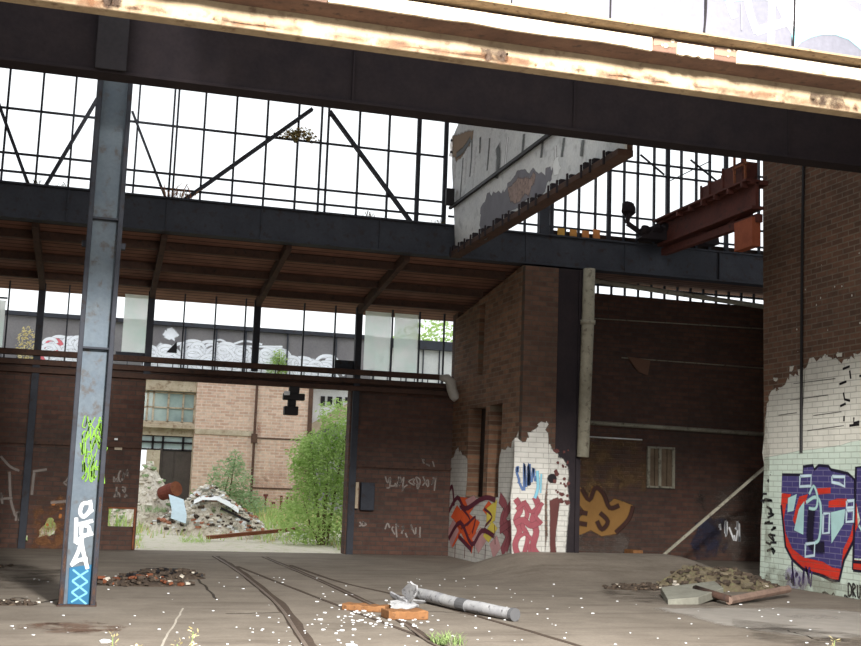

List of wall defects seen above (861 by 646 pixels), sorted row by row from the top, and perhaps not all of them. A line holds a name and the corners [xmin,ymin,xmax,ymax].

peeling [479,156,562,240]
peeling [448,421,569,562]
peeling [716,352,861,600]